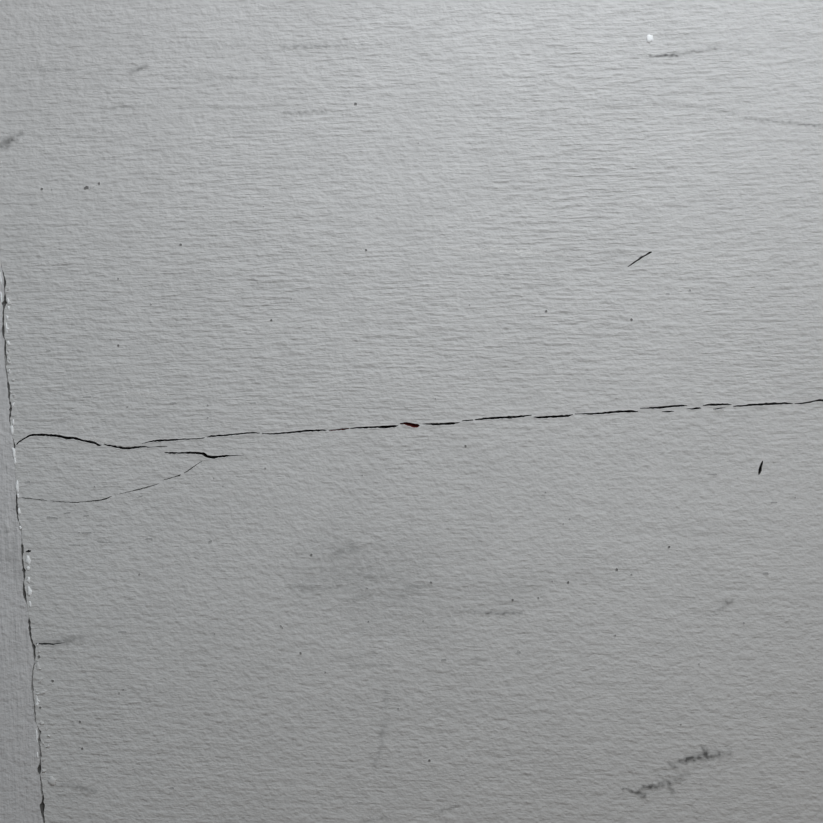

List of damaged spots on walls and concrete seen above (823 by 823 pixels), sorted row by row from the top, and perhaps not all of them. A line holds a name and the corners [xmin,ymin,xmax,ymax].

crack [0,252,823,823]